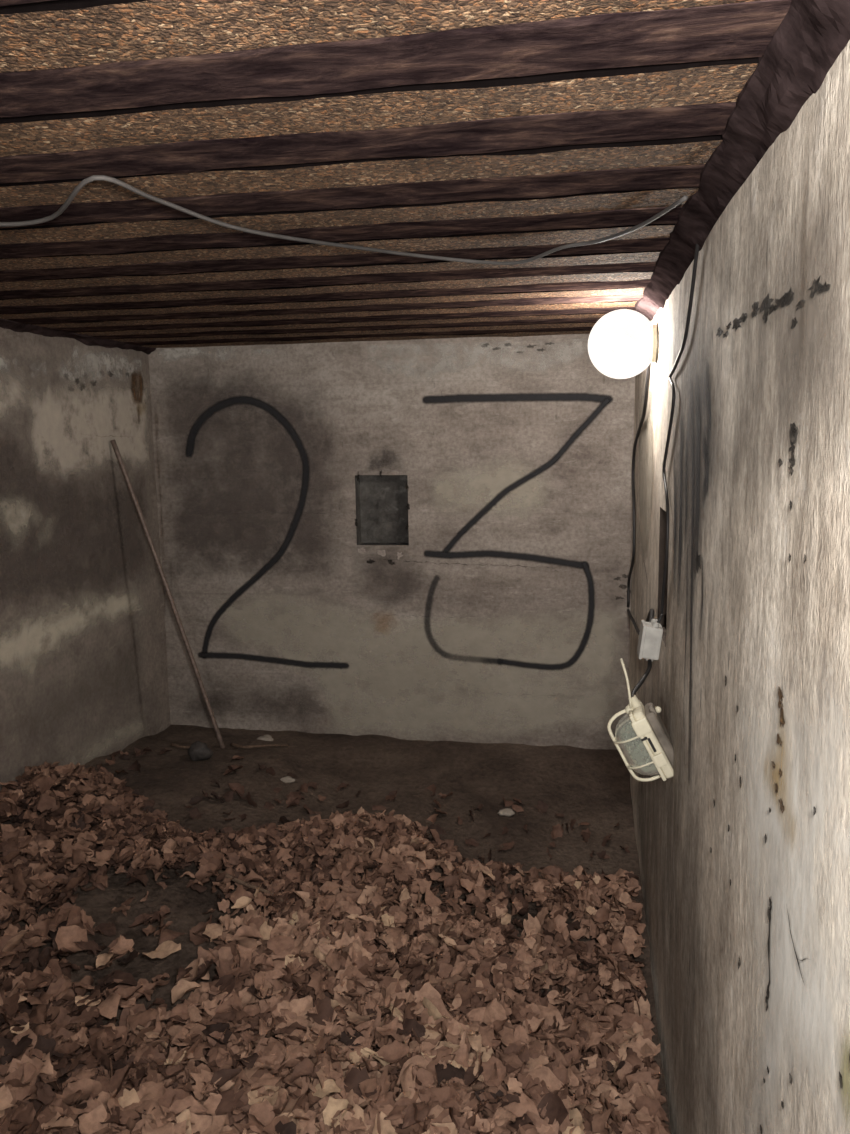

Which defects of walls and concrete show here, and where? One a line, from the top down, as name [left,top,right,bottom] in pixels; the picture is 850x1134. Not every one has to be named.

water stain [0,444,144,673]
water stain [674,345,711,754]
corrosion [771,686,785,813]
crack [765,897,810,1011]